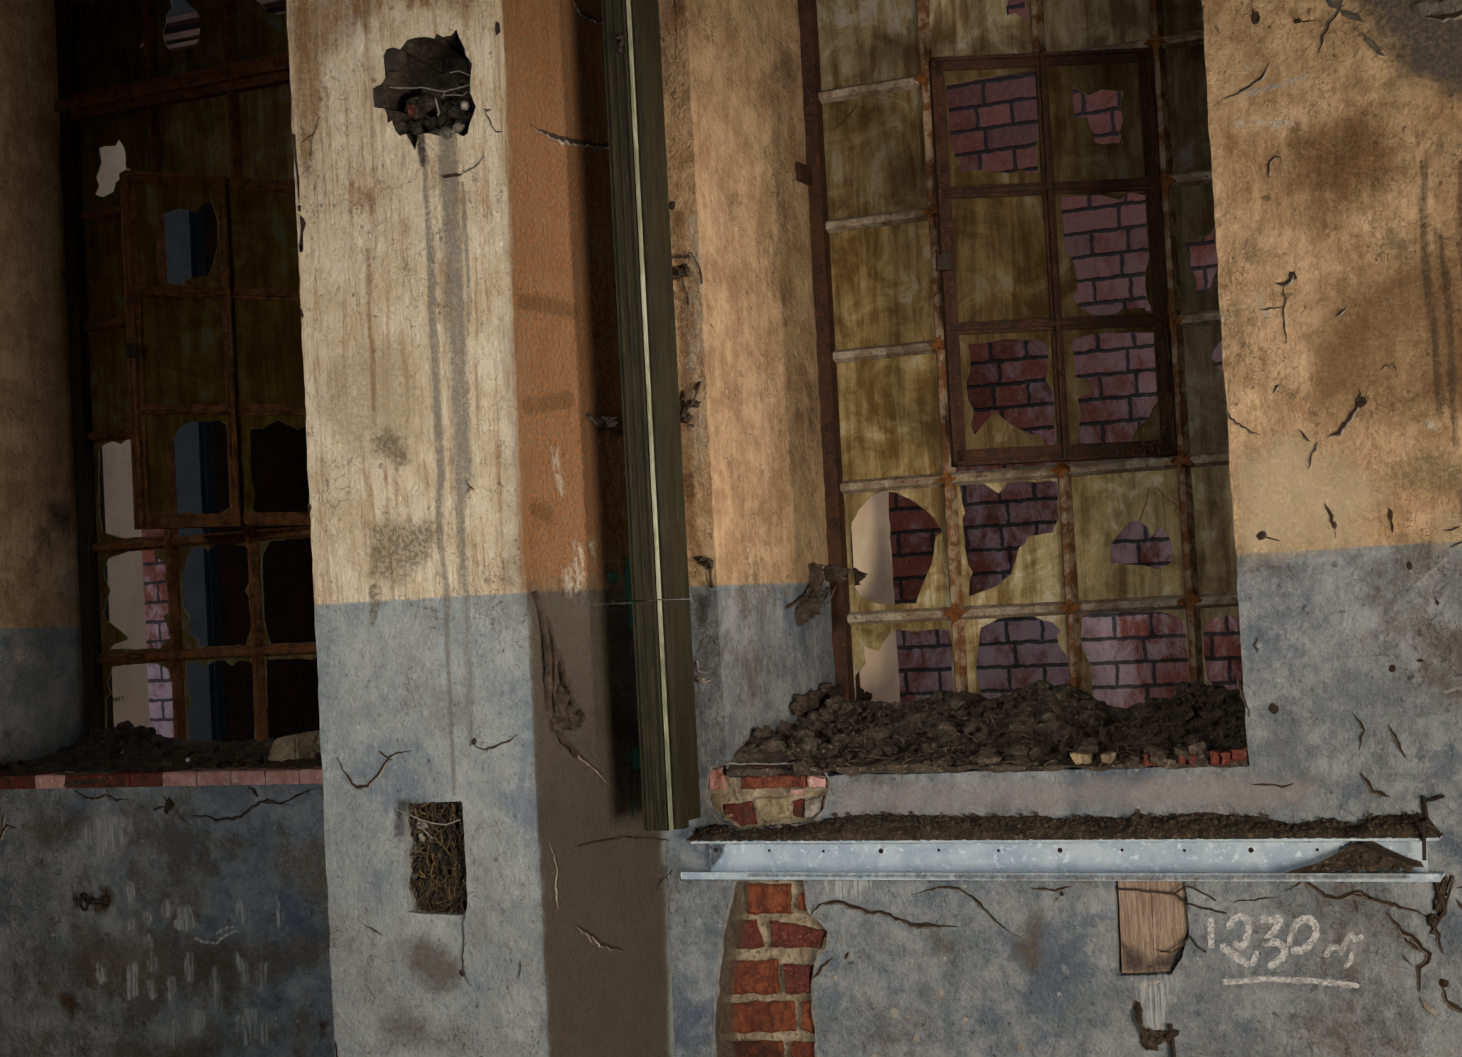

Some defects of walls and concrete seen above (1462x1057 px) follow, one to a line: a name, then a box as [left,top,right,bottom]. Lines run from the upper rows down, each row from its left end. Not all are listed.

hole [373,29,476,149]
leakage [1326,209,1462,416]
leakage [369,130,472,790]
crack [0,813,17,841]
crack [73,750,411,826]
spalling [703,762,831,830]
flaking render [712,879,830,1057]
crack [813,952,850,980]
crack [811,886,1021,938]
crack [1235,881,1462,1013]